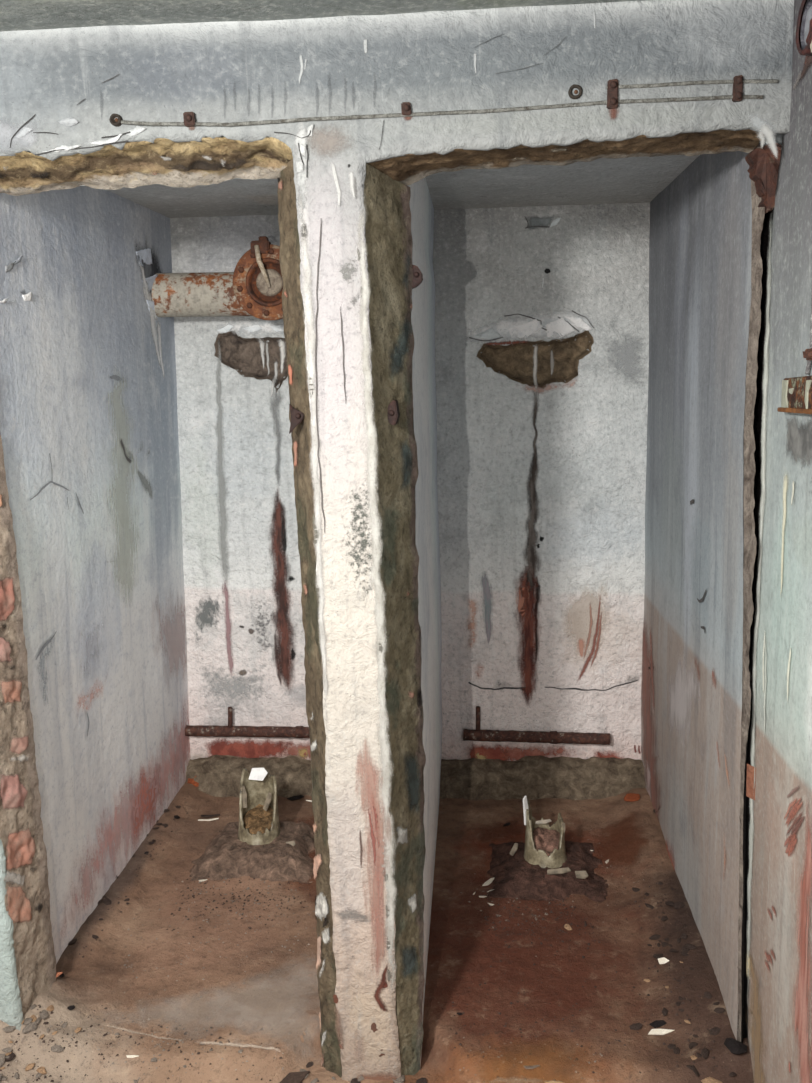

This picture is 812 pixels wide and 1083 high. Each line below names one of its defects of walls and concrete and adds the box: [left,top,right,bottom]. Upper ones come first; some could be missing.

spalling [0,114,342,1078]
water stain [195,352,257,699]
corrosion [271,394,295,689]
corrosion [517,397,540,703]
spalling [357,129,765,1075]
corrosion [579,601,602,679]
spalling [737,180,773,1043]
water stain [787,419,812,464]
corrosion [358,744,388,1011]
corrosion [784,786,812,1083]